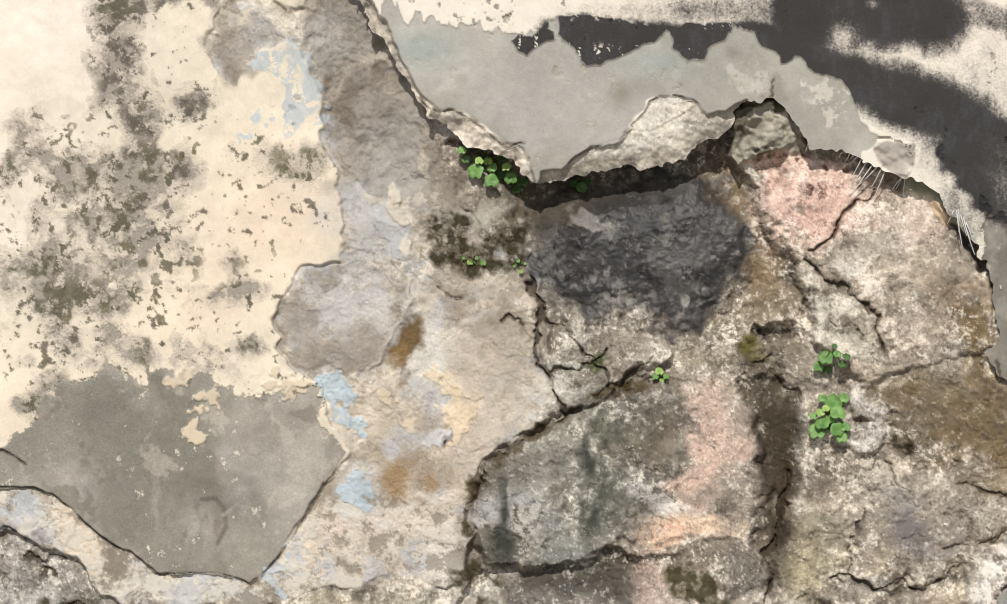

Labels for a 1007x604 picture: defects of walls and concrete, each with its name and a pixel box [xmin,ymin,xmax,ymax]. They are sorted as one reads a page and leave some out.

leakage [0,0,768,429]
crack [430,278,464,299]
peeling [204,0,1007,380]
crack [803,188,885,353]
peeling [0,149,1007,604]
leakage [496,421,521,459]
crack [464,276,660,537]
crack [760,469,792,604]
crack [752,353,802,402]
crack [830,509,996,592]
crack [957,481,1007,498]